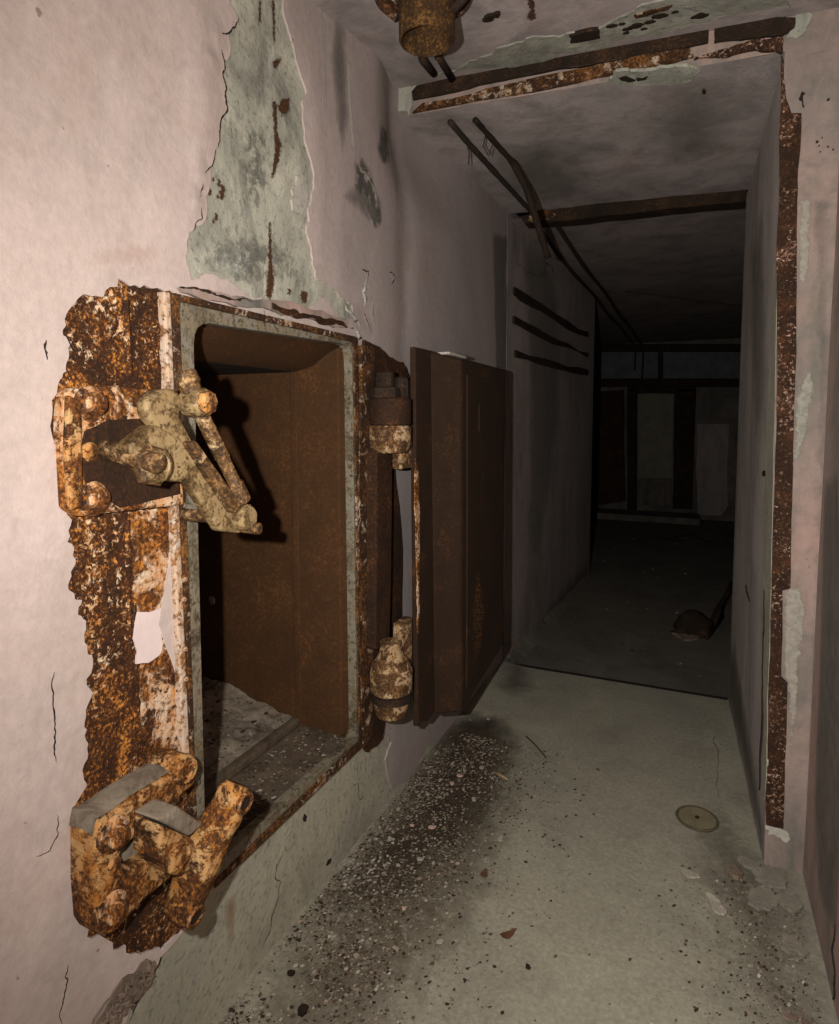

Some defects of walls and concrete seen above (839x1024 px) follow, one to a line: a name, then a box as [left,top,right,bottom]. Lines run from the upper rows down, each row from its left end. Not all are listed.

rust [482,11,500,23]
peeling [437,0,812,76]
peeling [608,63,700,87]
rust [606,5,709,35]
peeling [176,0,375,340]
peeling [758,259,805,797]
peeling [91,733,405,1024]